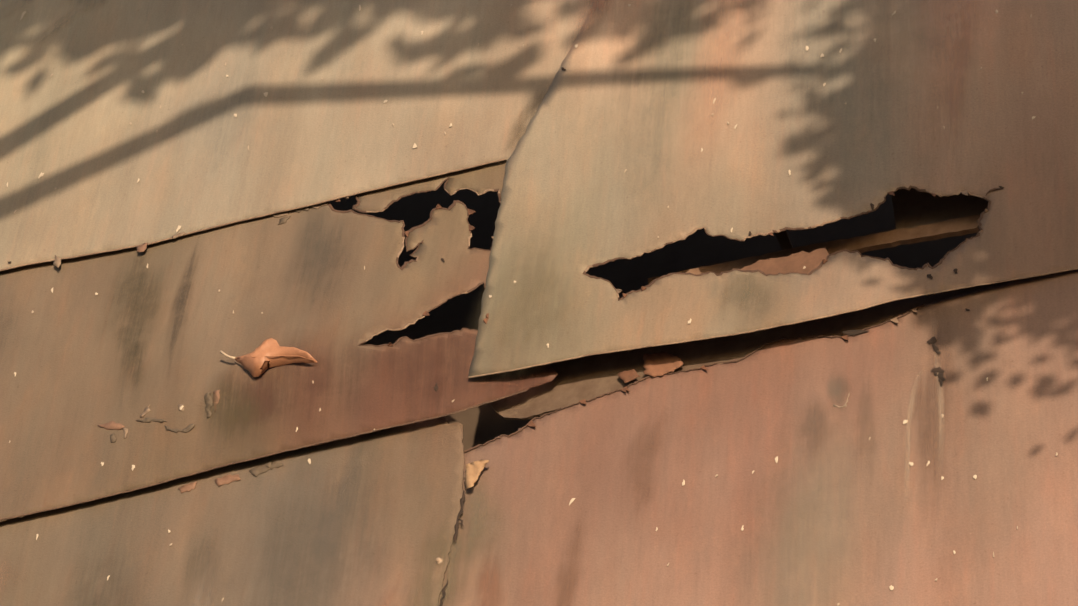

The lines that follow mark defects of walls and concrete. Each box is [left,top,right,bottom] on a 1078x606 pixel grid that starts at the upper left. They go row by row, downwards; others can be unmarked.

corrosion [617,351,683,383]
hole [927,336,945,387]
peeling [97,405,195,443]